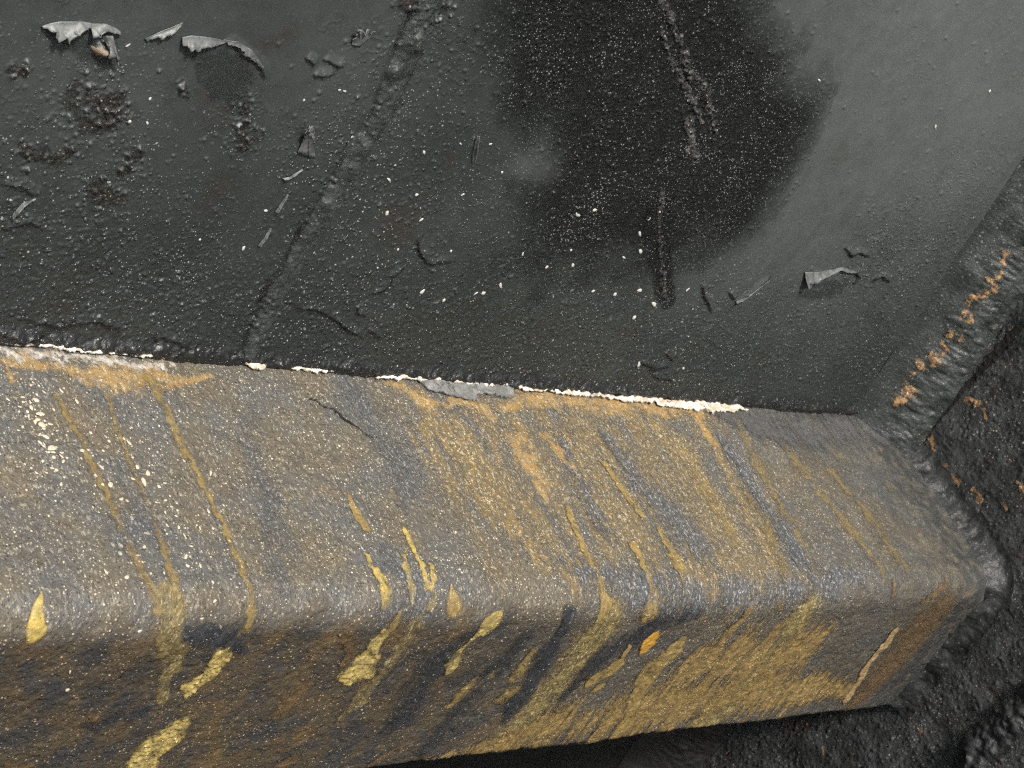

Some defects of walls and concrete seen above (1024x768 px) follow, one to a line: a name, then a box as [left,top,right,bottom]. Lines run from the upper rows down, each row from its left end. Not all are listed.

peeling [41,21,122,66]
peeling [145,22,264,69]
leakage [507,0,815,309]
peeling [805,267,858,290]
corrosion [959,251,1008,323]
leakage [15,343,152,358]
corrosion [893,330,963,406]
crack [310,398,373,438]
corrosion [0,349,257,705]
corrosion [384,381,955,760]
corrosion [337,527,437,687]
corrosion [126,716,191,768]